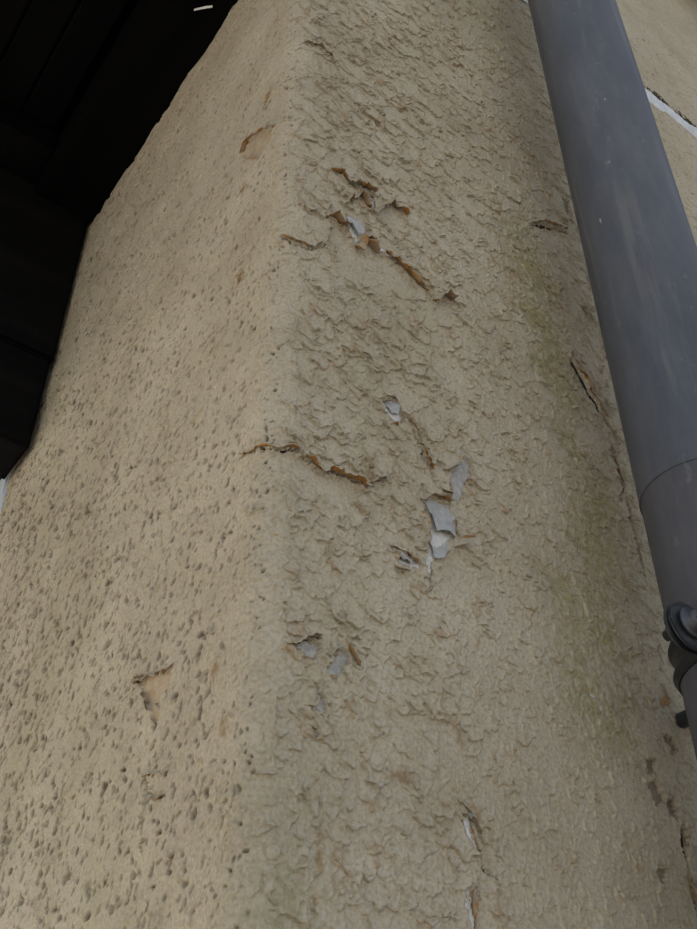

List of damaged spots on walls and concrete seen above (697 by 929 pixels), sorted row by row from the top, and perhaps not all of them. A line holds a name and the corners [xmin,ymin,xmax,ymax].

peeling [326,167,430,290]
peeling [378,394,405,427]
peeling [389,448,479,579]
crack [614,449,636,540]
spalling [129,662,174,726]
crack [458,800,485,929]
crack [680,830,697,916]